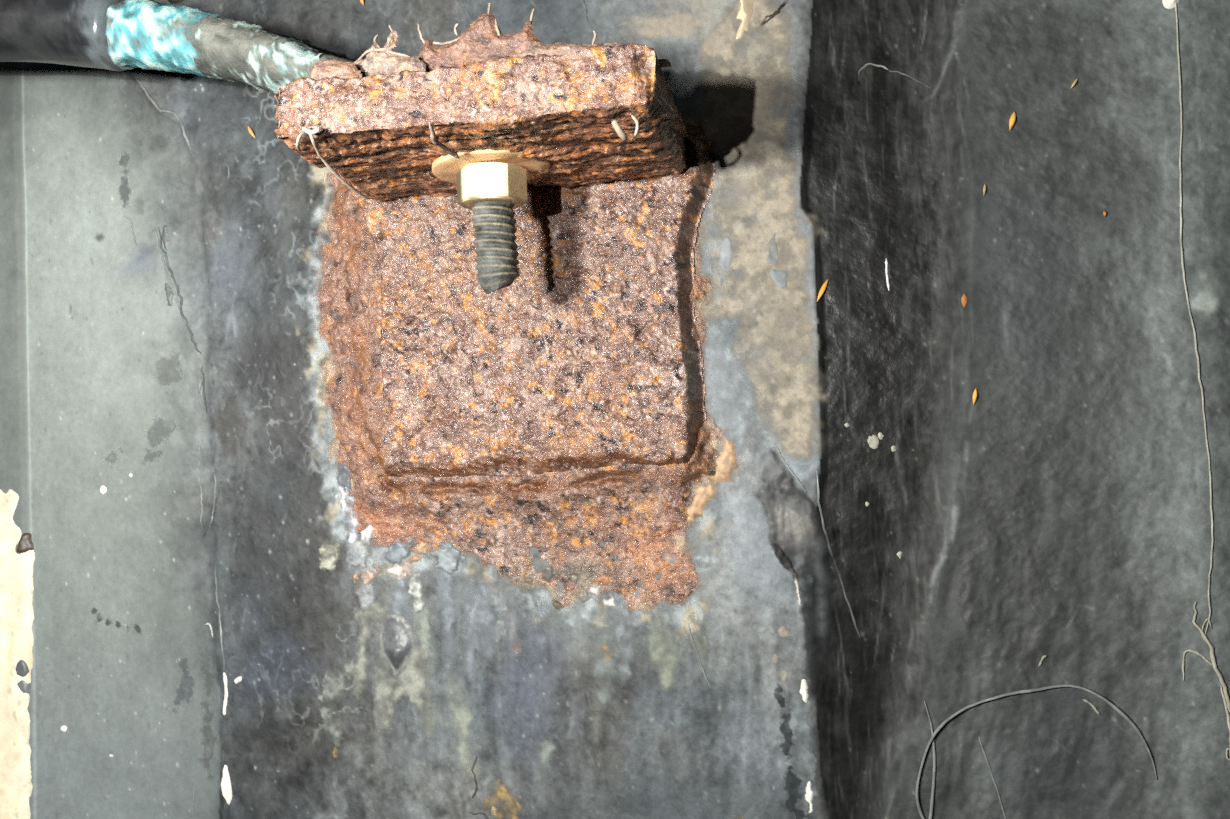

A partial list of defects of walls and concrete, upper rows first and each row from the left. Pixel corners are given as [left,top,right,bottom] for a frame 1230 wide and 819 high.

peeling [736,0,755,39]
peeling [718,237,733,269]
peeling [766,232,787,289]
rust [304,166,438,584]
rust [687,439,737,574]
peeling [0,489,35,819]
leakage [357,566,374,609]
leakage [392,571,520,675]
rust [453,558,497,583]
rust [515,565,707,638]
leakage [594,608,632,704]
leakage [449,686,476,773]